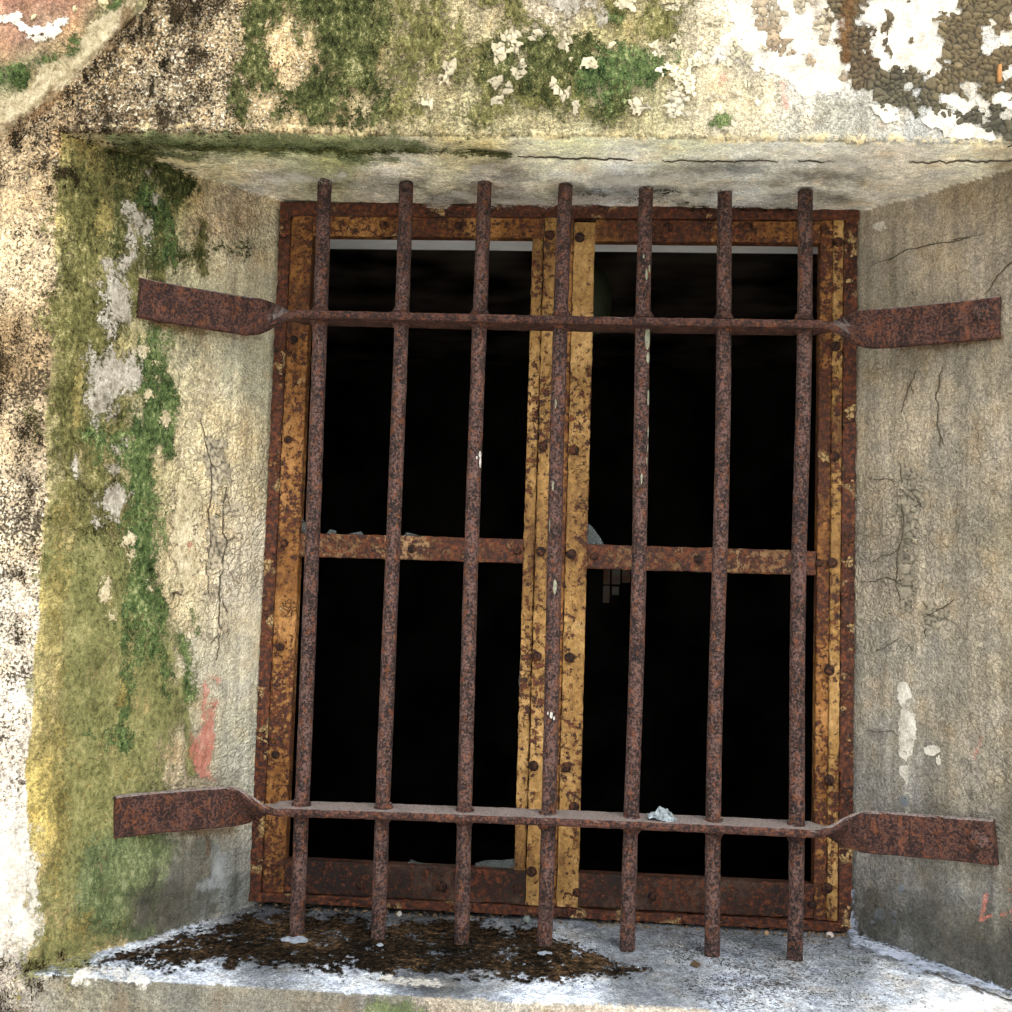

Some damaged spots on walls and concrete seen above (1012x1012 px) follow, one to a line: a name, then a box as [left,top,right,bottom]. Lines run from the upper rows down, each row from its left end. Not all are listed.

peeling [628,0,1012,142]
crack [870,234,981,266]
leakage [69,359,84,427]
leakage [156,368,180,461]
crack [901,367,944,447]
crack [863,463,954,651]
peeling [892,465,953,628]
leakage [114,634,133,722]
leakage [158,608,201,785]
peeling [897,681,941,806]
leakage [380,974,445,987]